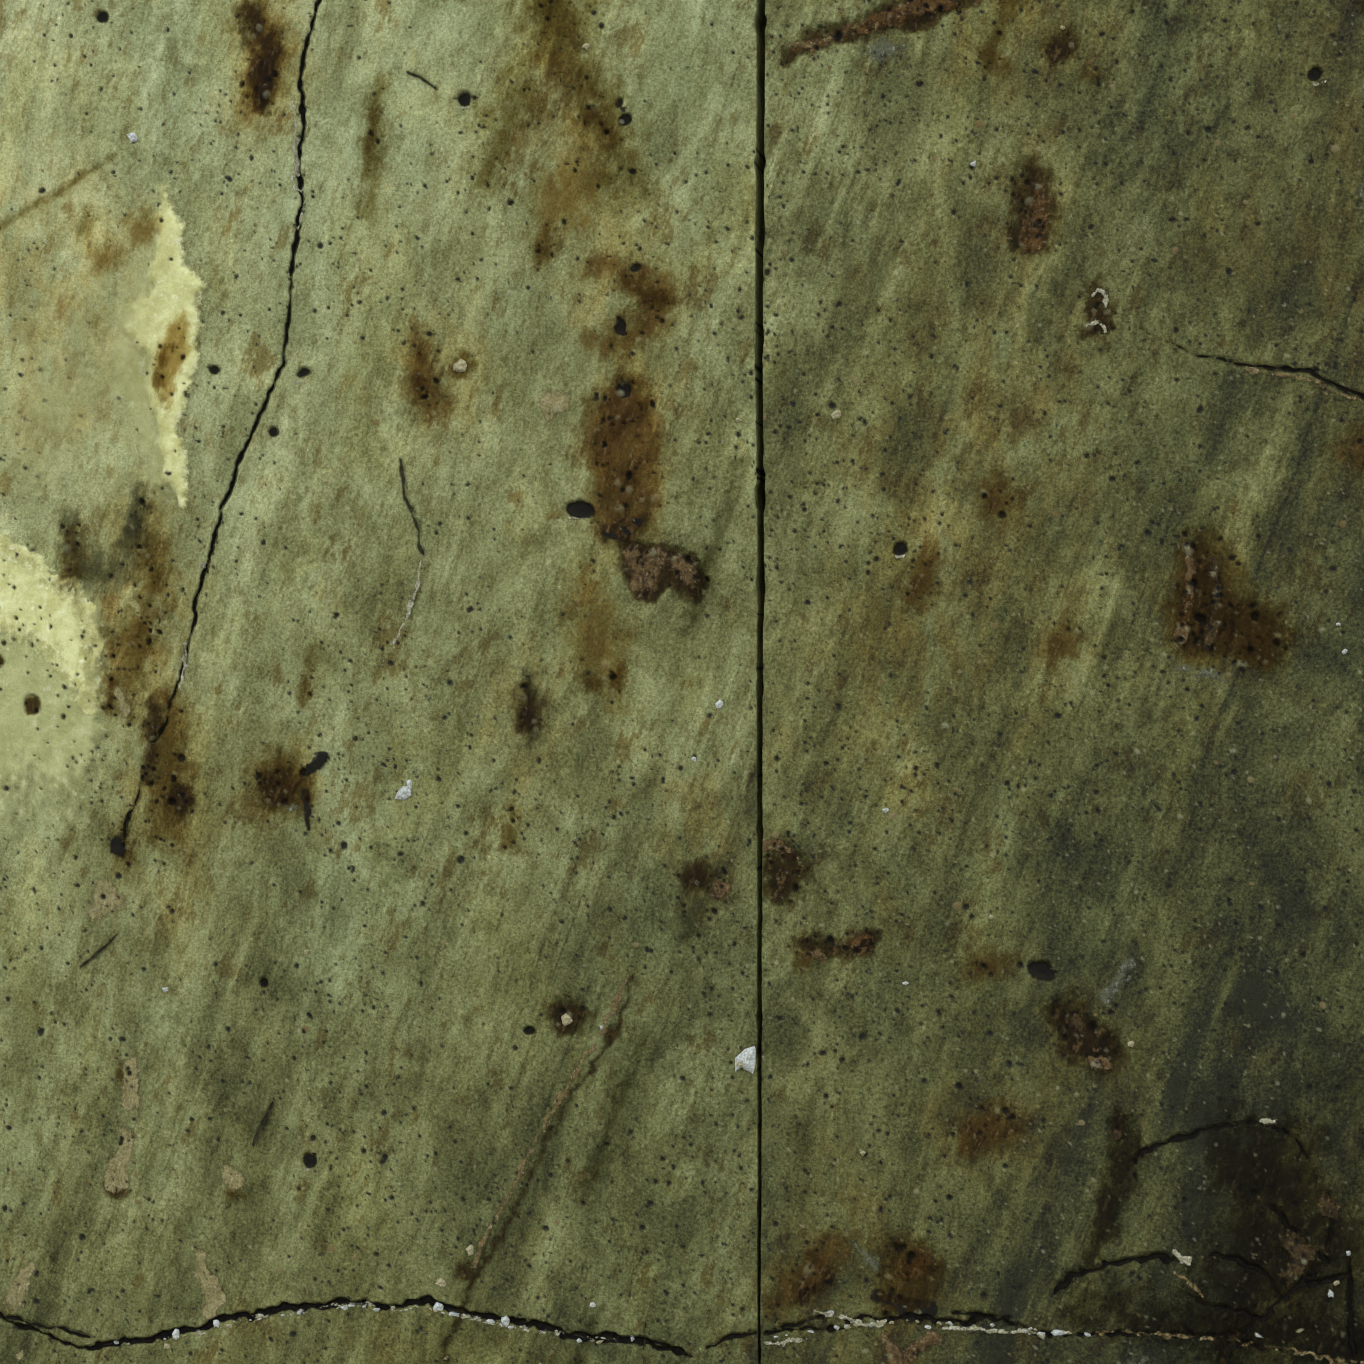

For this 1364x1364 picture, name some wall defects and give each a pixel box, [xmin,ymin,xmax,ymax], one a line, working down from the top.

corrosion [1010,169,1052,253]
crack [153,0,321,742]
crack [1140,328,1364,402]
corrosion [601,514,646,543]
crack [123,775,144,848]
crack [0,974,1364,1364]